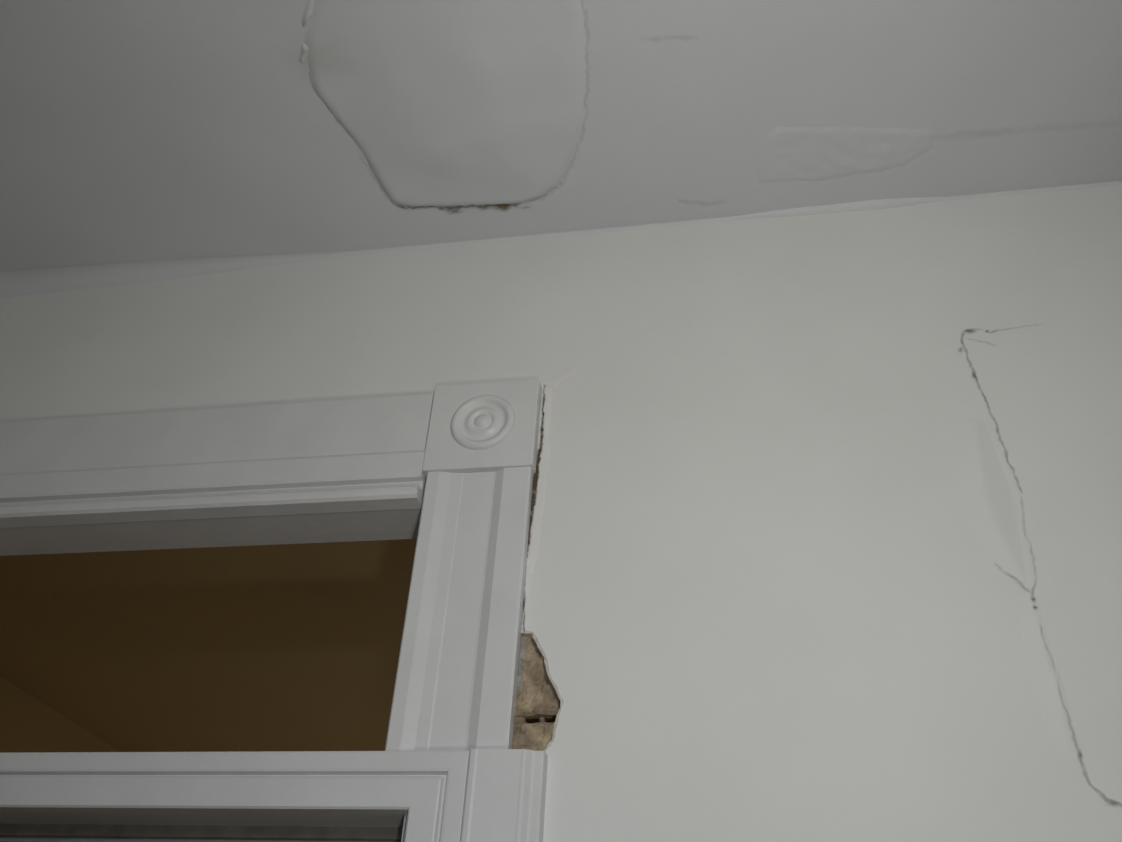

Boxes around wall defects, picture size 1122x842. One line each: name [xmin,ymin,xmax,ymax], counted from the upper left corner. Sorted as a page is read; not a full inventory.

crack [401,203,509,211]
flaking render [512,629,564,752]